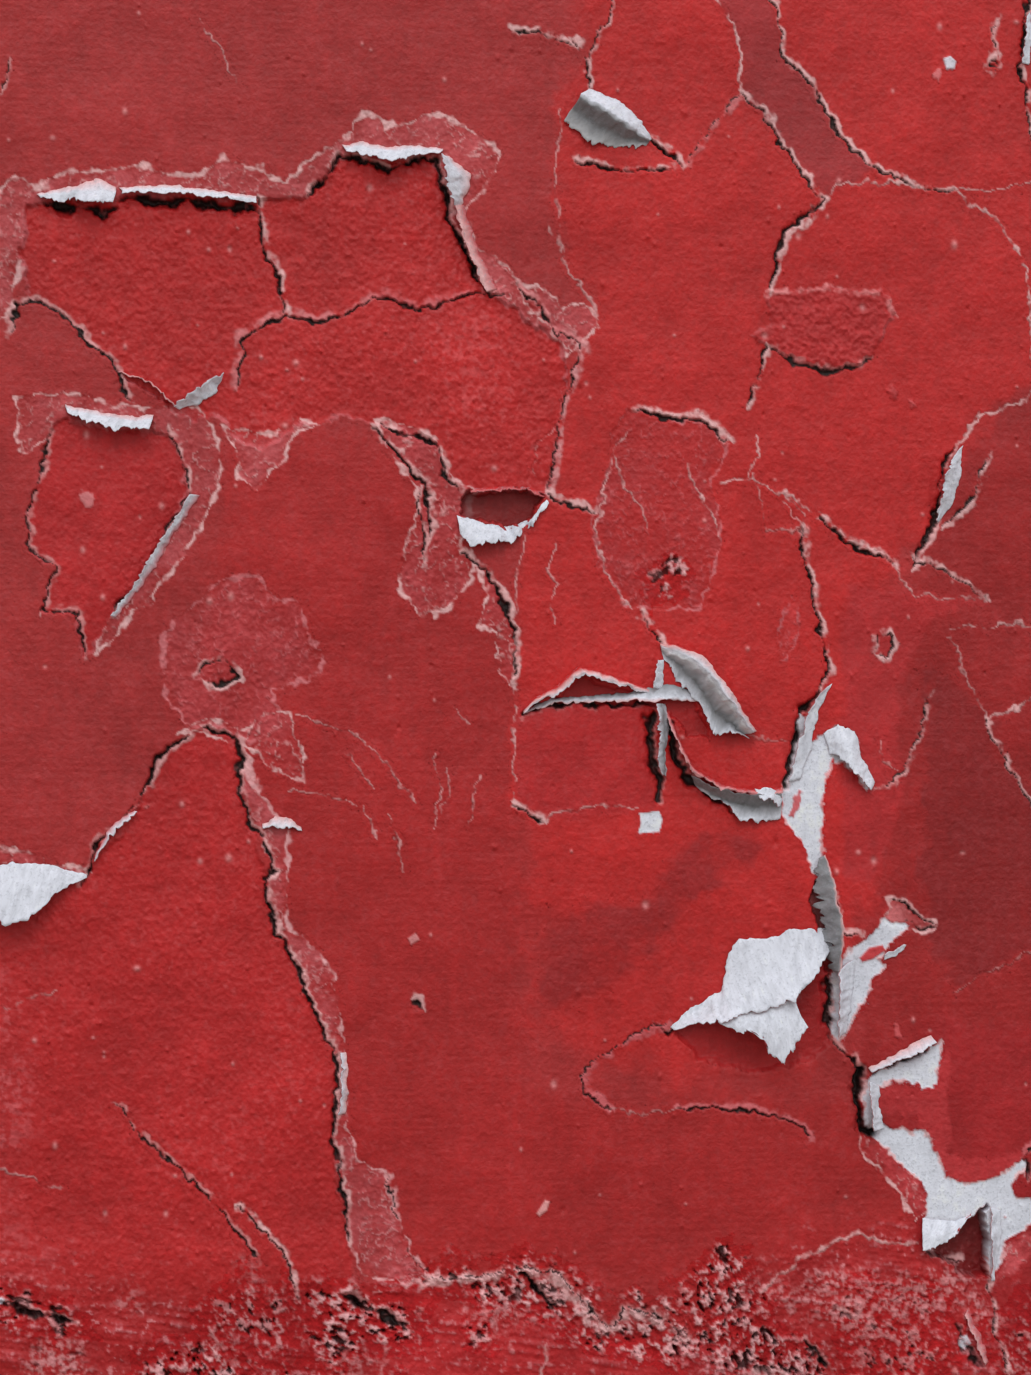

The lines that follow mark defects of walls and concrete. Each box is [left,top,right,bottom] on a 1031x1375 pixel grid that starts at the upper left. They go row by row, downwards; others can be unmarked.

peeling [564,89,687,177]
crack [683,0,1031,447]
peeling [0,107,576,691]
crack [507,0,642,828]
crack [717,341,1031,813]
crack [0,986,63,1016]
peeling [0,405,1031,1375]
crack [954,949,1031,997]
crack [0,1166,68,1196]
crack [110,1102,298,1278]
crack [606,1103,816,1148]
crack [757,1228,922,1298]